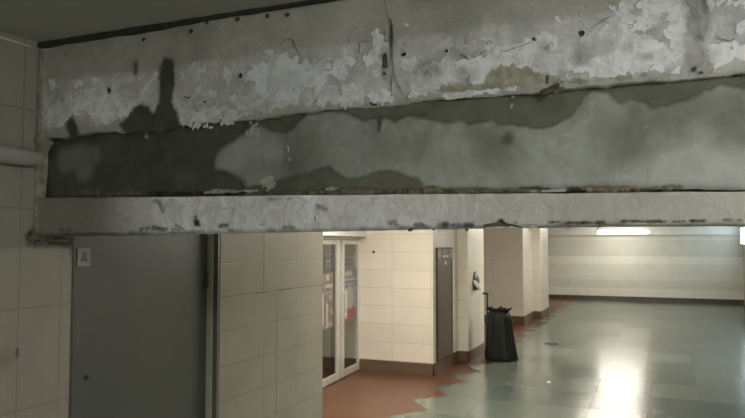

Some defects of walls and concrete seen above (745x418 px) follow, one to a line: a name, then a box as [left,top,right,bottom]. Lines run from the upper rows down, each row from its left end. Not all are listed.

peeling [706,0,745,12]
peeling [45,71,158,131]
water stain [46,58,422,198]
peeling [176,27,393,131]
crack [349,0,403,96]
water stain [318,75,745,128]
peeling [400,0,694,109]
peeling [693,20,745,74]
spalling [26,228,75,247]